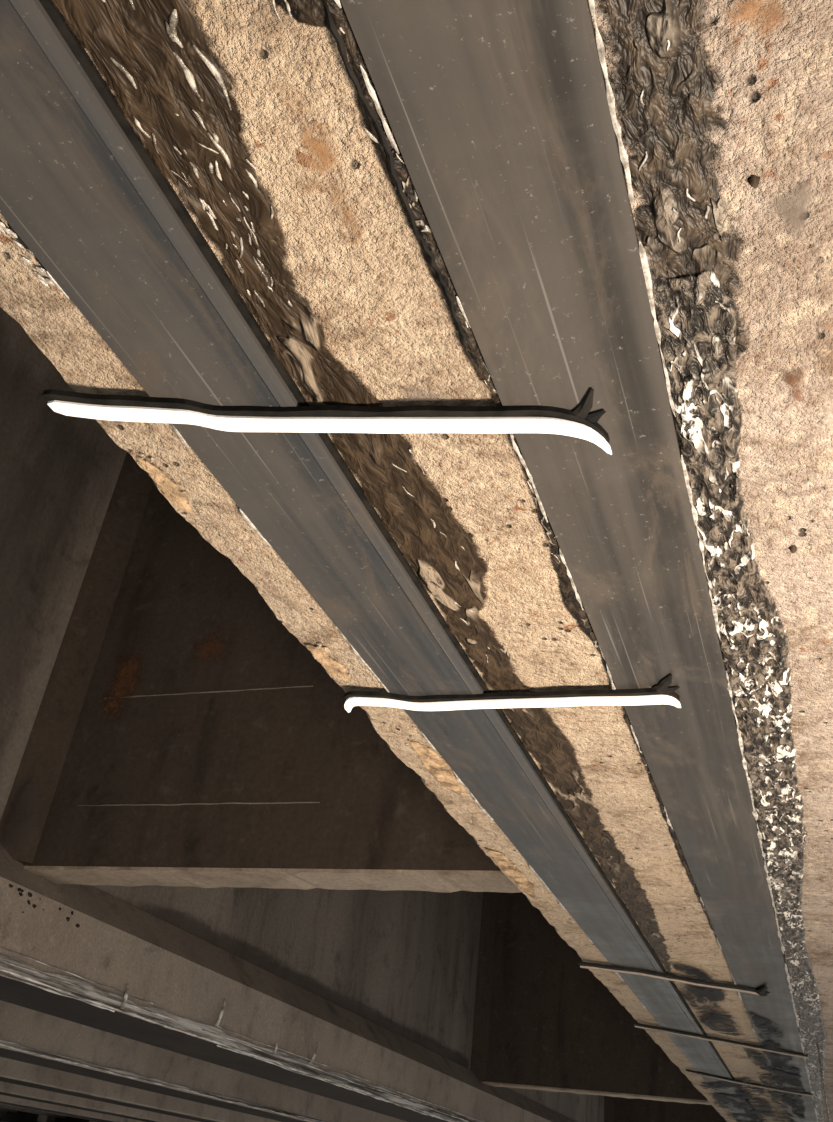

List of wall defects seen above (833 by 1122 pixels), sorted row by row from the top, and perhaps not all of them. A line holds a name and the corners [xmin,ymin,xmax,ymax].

spalling [306,643,350,682]
peeling [651,271,831,1122]
spalling [486,849,542,900]